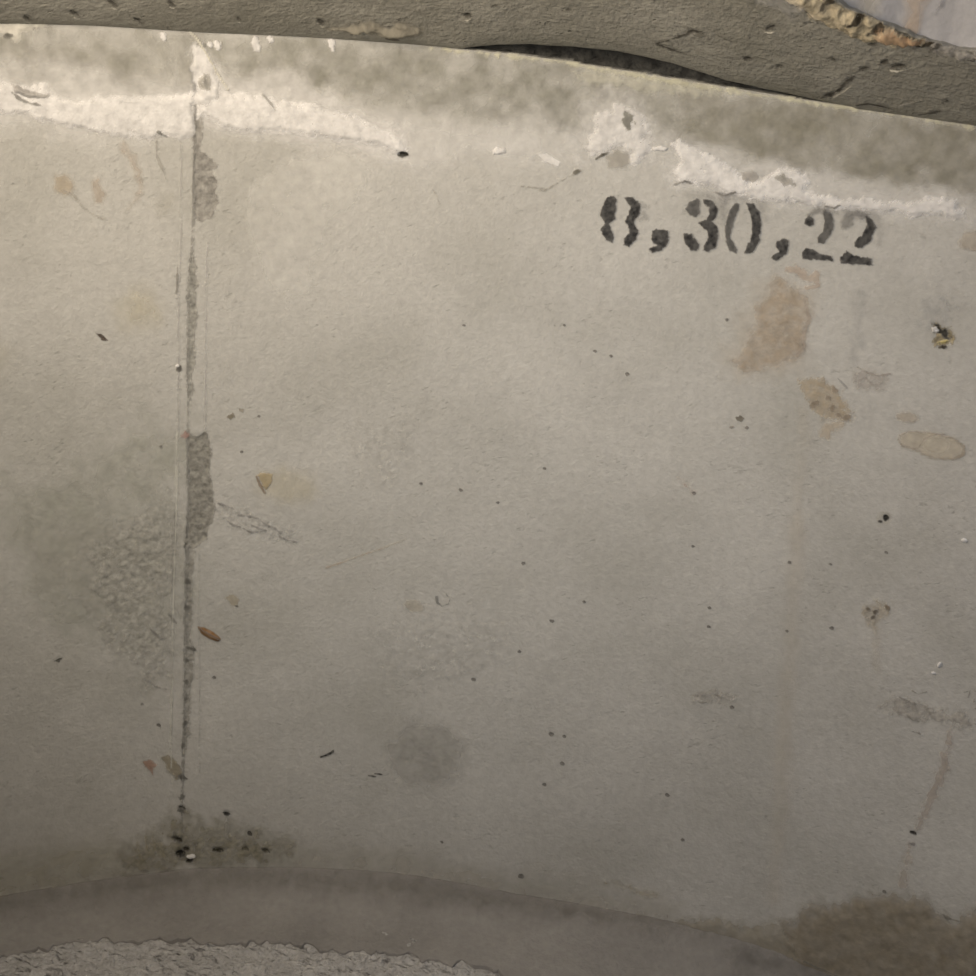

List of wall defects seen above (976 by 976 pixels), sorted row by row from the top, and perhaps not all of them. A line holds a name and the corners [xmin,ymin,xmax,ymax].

spalling [785,0,976,62]
spalling [858,60,905,73]
water stain [0,24,976,221]
water stain [734,266,820,372]
crack [144,113,218,859]